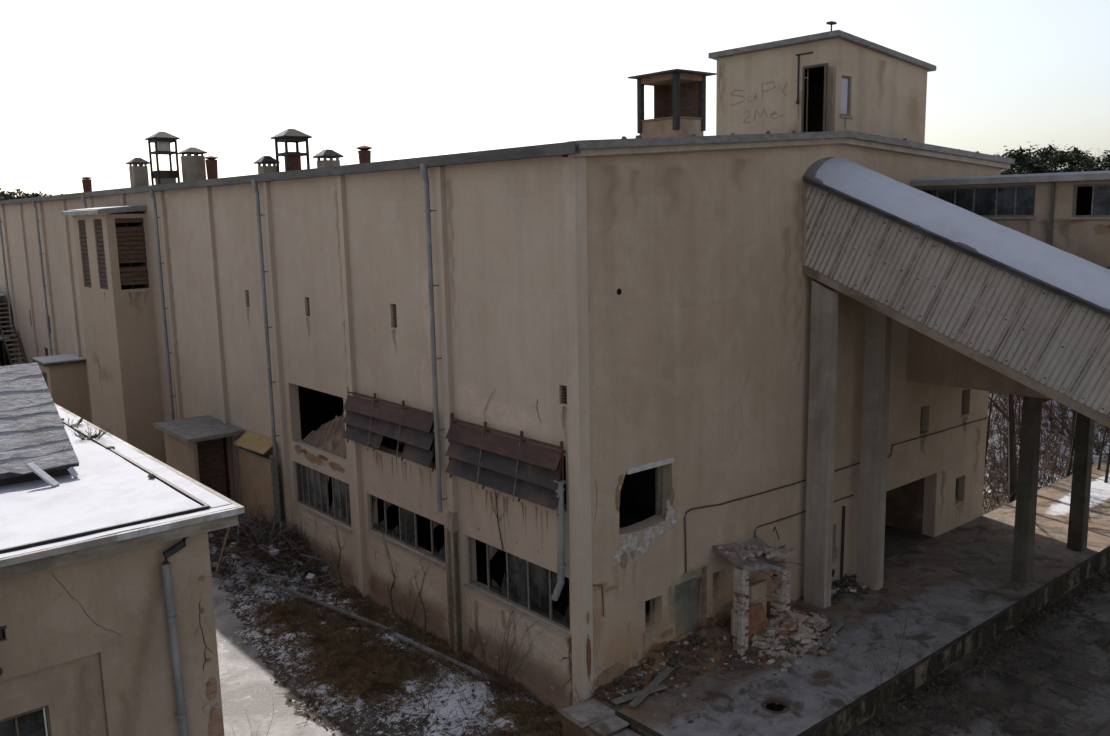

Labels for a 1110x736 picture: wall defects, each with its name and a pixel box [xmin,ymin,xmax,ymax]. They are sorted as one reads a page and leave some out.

spalling [294,445,345,473]
spalling [614,488,677,569]
crack [195,576,212,687]
flaking render [203,677,224,736]